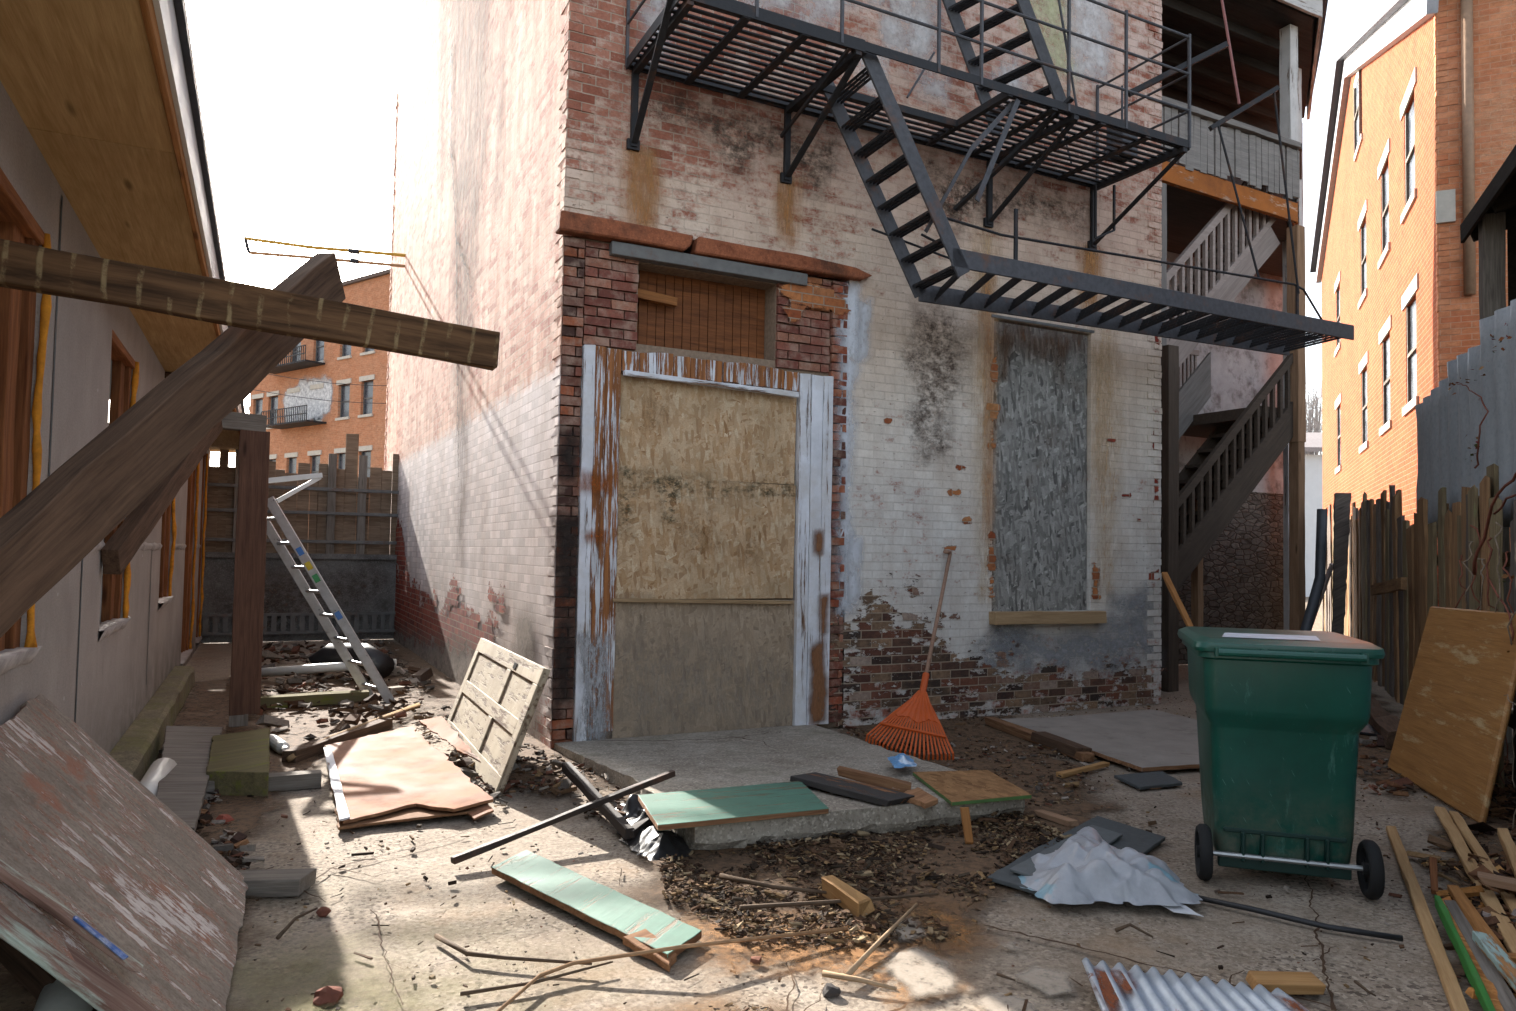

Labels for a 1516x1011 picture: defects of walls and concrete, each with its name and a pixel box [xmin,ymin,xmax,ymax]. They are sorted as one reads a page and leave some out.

leakage [907,317,962,430]
peeling [394,519,506,657]
peeling [814,531,823,554]
peeling [809,573,1166,726]